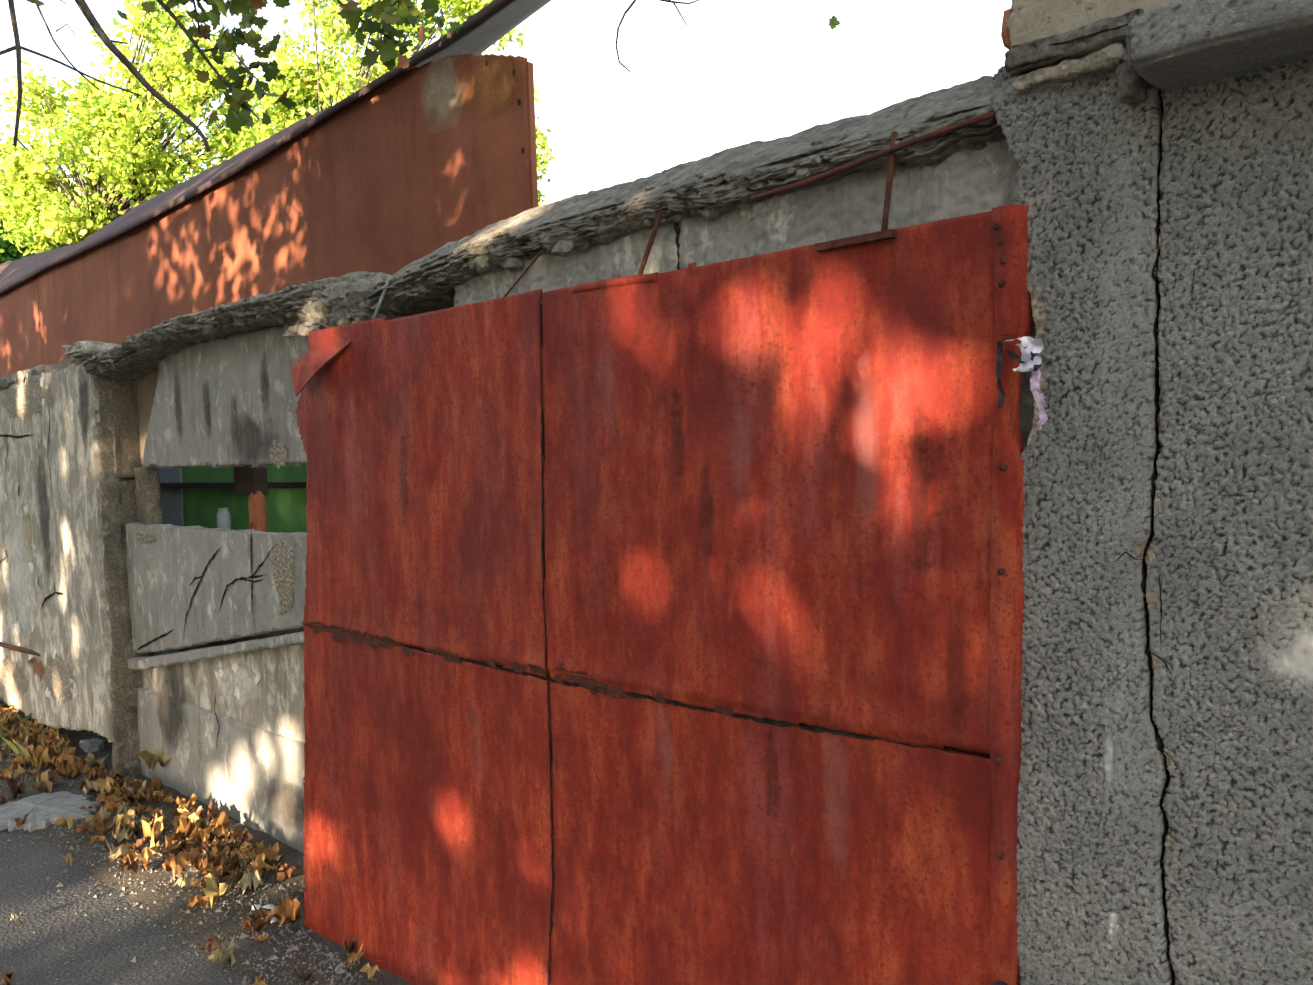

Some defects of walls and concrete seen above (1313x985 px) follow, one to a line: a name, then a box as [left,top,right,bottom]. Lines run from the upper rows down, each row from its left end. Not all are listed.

corrosion [751,110,996,201]
crack [1114,90,1176,985]
crack [137,526,274,650]
corrosion [0,642,44,679]
corrosion [301,621,463,666]
corrosion [487,659,629,699]